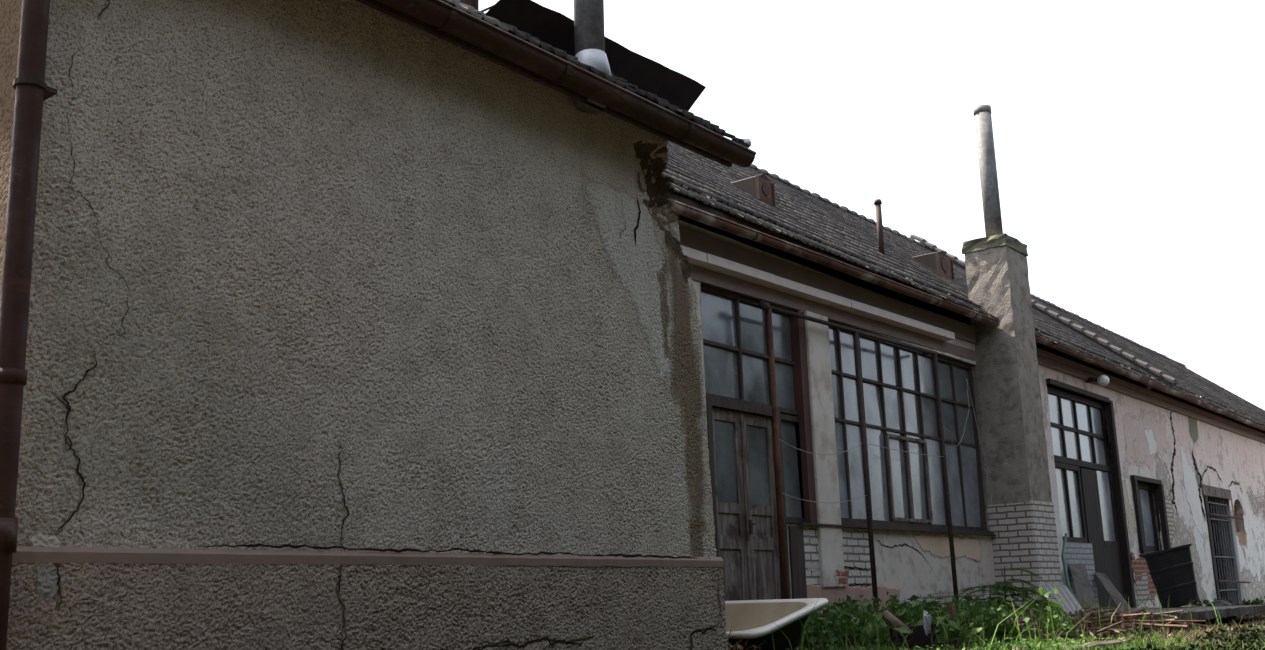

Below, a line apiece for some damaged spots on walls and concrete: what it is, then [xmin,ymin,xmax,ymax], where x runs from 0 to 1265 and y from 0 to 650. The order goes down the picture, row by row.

crack [620,198,641,245]
crack [54,0,129,609]
crack [196,448,722,650]
water stain [658,251,704,557]
flaking render [803,527,986,614]
flaking render [1122,481,1156,606]
peeling [1156,444,1208,607]
crack [1170,411,1242,515]
peeling [1239,537,1265,605]
peeling [1248,481,1265,521]